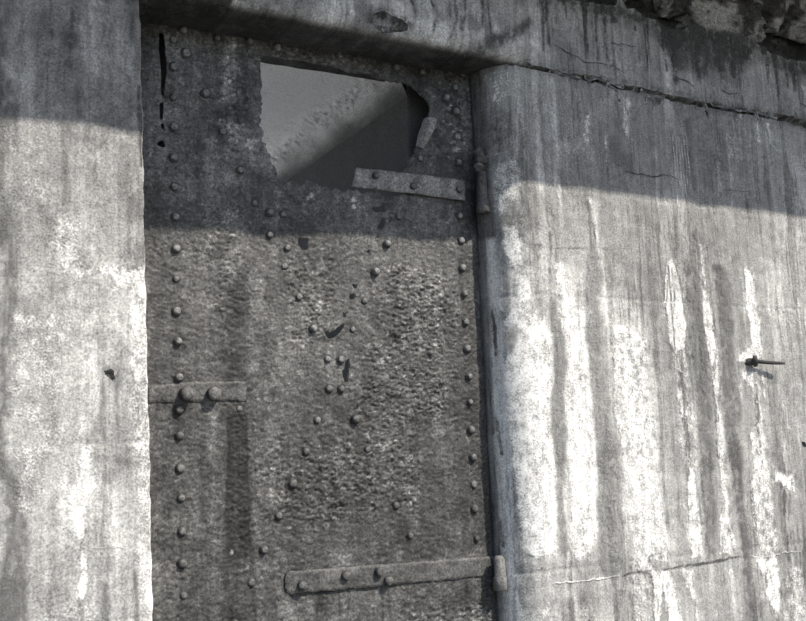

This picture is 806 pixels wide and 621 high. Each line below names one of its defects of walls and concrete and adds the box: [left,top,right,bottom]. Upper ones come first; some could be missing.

spalling [370,11,408,33]
spalling [579,0,689,31]
crack [525,26,806,129]
leakage [537,0,806,98]
spalling [758,32,806,61]
leakage [0,73,75,621]
leakage [44,215,153,621]
leakage [493,160,682,621]
leakage [687,258,717,558]
leakage [717,268,806,621]
crack [555,551,802,583]
leakage [682,568,696,599]